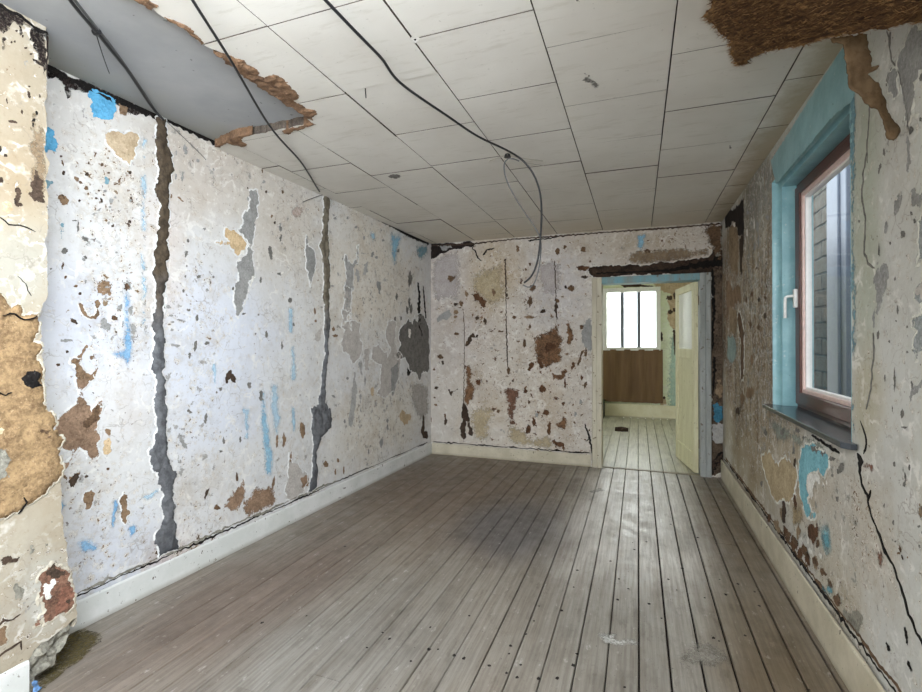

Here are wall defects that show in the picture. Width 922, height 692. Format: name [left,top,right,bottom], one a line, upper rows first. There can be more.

peeling [885,23,922,172]
peeling [232,169,267,319]
peeling [314,216,508,427]
peeling [512,285,546,328]
crack [861,107,874,269]
peeling [872,188,922,343]
spalling [0,293,111,521]
crack [77,312,592,597]
peeling [764,423,844,500]
crack [857,333,922,645]
spalling [0,614,22,656]
spalling [29,560,77,692]